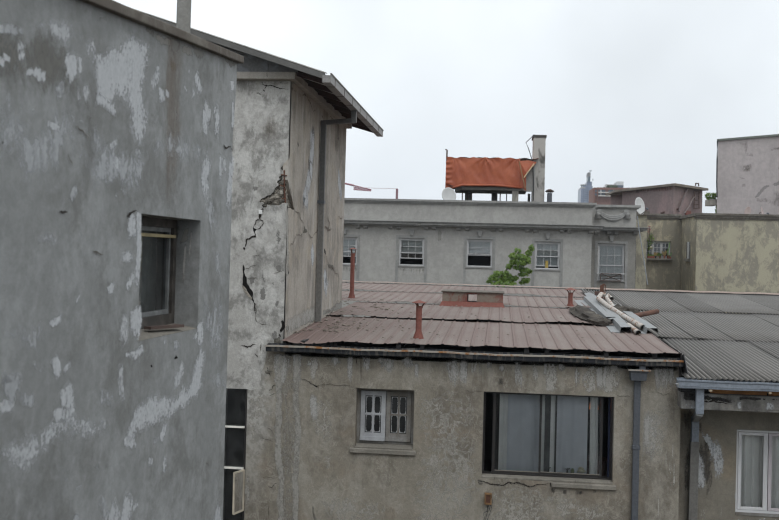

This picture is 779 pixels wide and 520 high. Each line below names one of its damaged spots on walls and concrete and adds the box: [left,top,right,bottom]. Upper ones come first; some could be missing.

peeling [26,67,46,82]
peeling [65,27,204,145]
crack [242,208,266,325]
spalling [259,167,318,277]
crack [478,477,551,487]
damp [698,424,724,487]